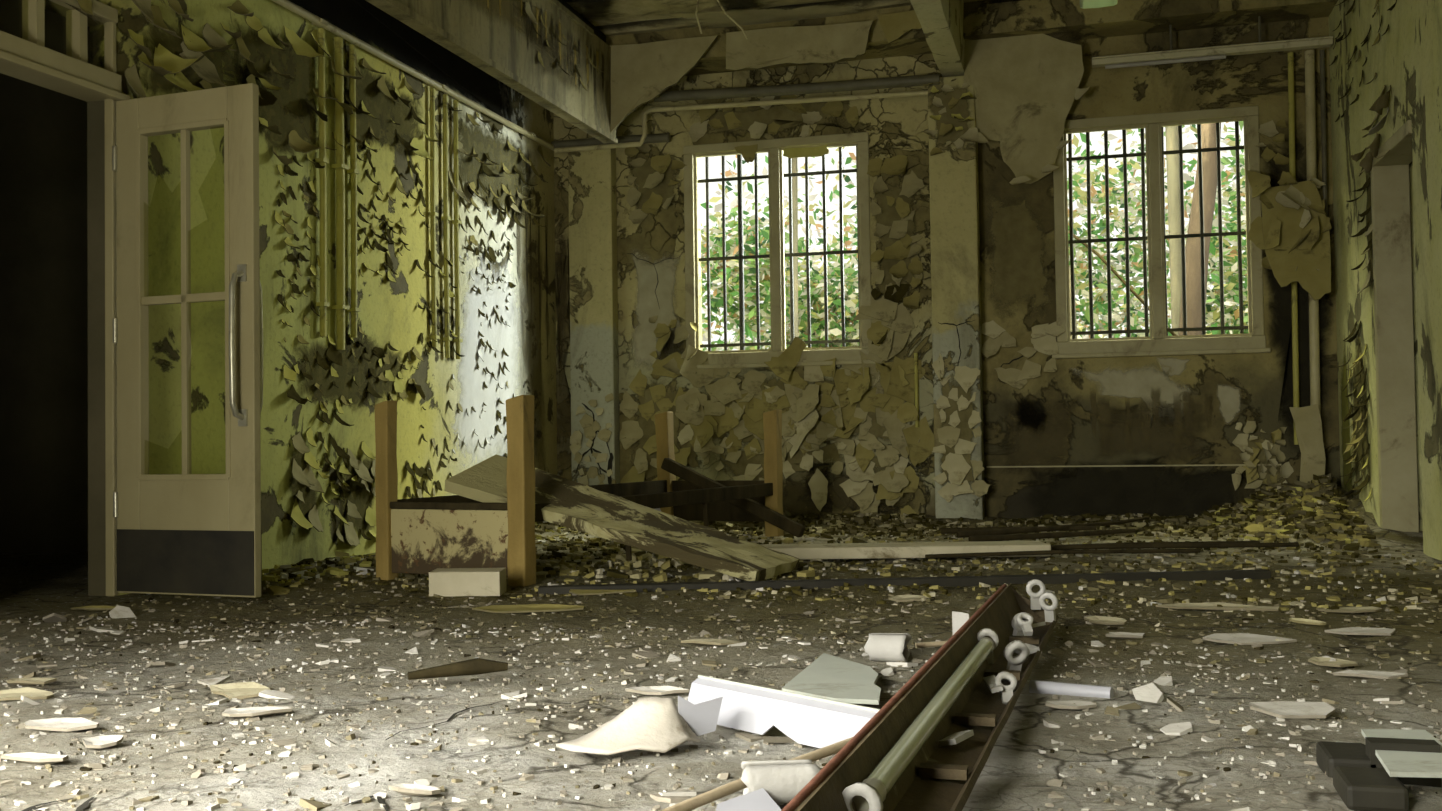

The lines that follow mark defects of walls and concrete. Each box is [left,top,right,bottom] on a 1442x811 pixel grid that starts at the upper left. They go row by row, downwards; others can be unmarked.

damp [289,0,520,125]
damp [525,0,604,95]
damp [719,0,759,11]
peeling [688,95,859,163]
peeling [923,77,978,156]
peeling [1329,0,1397,294]
peeling [125,0,551,546]
peeling [570,143,1065,515]
flaking render [1074,358,1189,421]
flaking render [1218,386,1240,423]